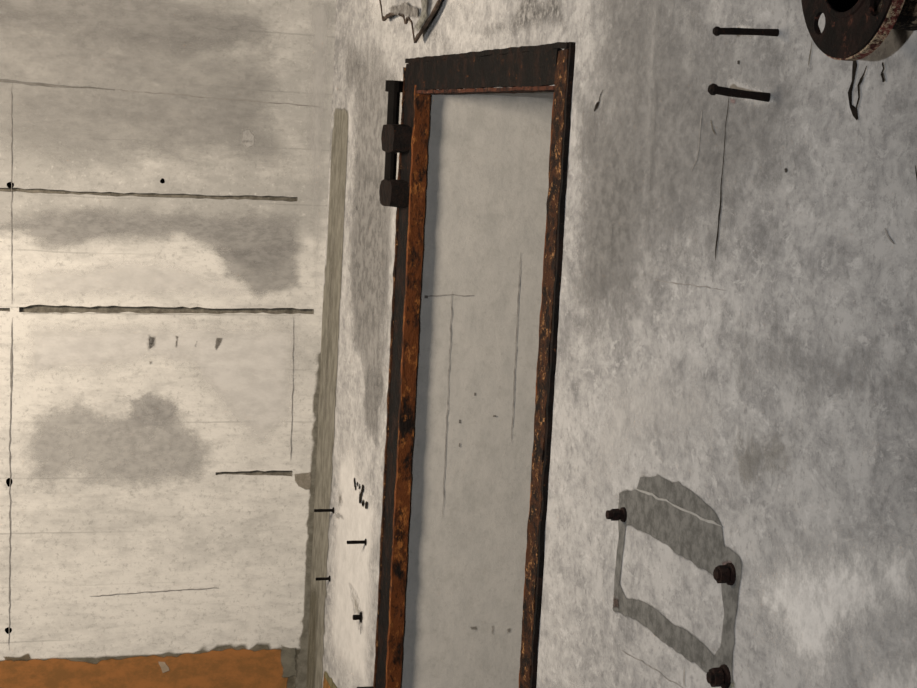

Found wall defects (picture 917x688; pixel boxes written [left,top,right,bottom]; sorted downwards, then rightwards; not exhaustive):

damp [13,211,295,293]
peeling [0,109,348,688]
damp [347,52,392,431]